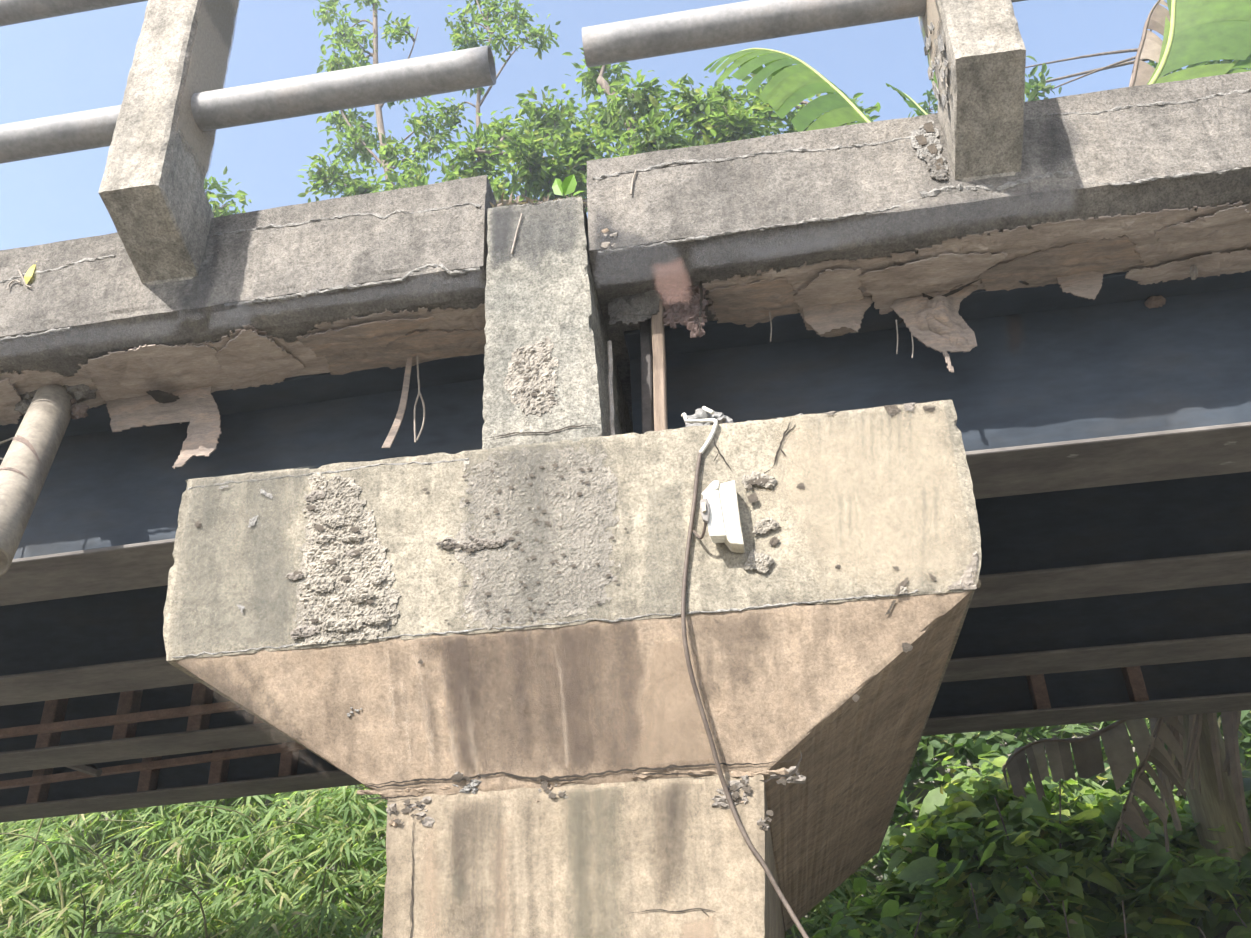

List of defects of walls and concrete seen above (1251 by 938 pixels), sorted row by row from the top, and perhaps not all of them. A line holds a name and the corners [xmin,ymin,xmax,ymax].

peeling [924,22,948,109]
spalling [910,120,948,180]
peeling [708,235,1251,337]
peeling [0,378,22,425]
peeling [83,316,486,403]
crack [713,438,732,471]
crack [764,423,796,474]
peeling [293,490,389,632]
crack [349,749,802,938]